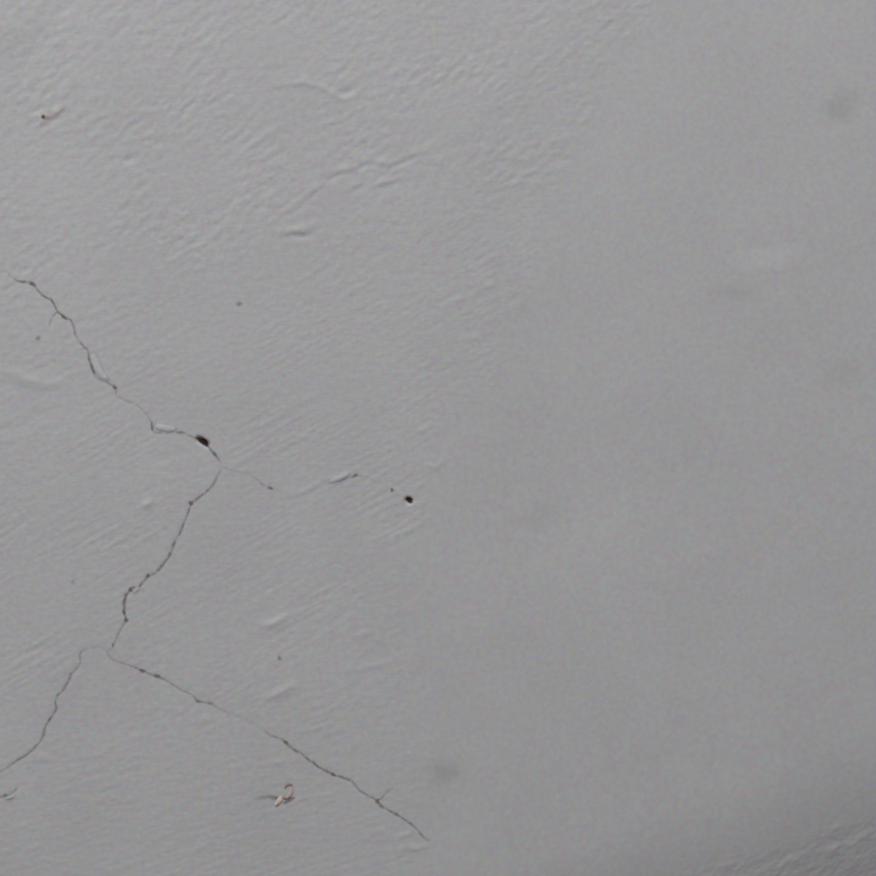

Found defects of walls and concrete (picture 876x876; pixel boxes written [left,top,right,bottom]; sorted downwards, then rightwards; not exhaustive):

crack [197,437,216,456]
crack [123,490,208,621]